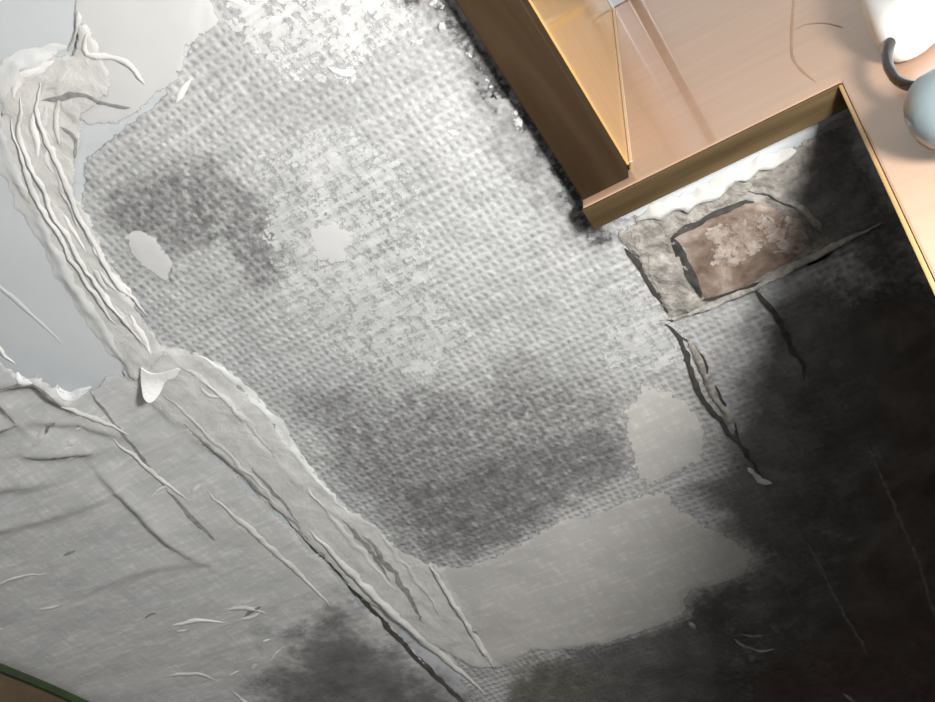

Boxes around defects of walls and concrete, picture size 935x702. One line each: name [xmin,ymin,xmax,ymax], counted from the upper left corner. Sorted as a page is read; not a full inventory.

peeling [0,11,164,389]
flaking render [0,348,492,702]
crack [184,424,486,702]
leakage [328,67,356,77]
leakage [261,614,445,702]
spalling [82,0,790,702]
leakage [435,0,612,244]
crack [625,248,772,485]
leakage [509,206,935,702]
spalling [618,115,930,325]
crack [755,291,806,379]